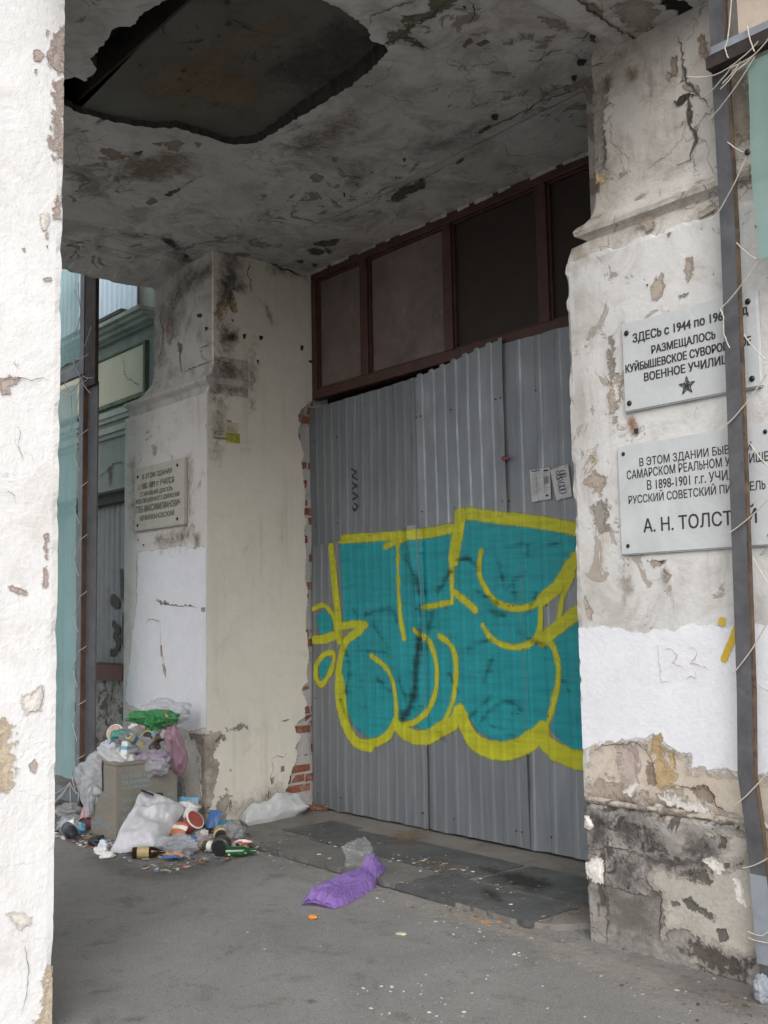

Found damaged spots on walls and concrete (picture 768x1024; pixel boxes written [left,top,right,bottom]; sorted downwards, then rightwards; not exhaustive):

peeling [33,25,65,173]
crack [674,38,709,165]
peeling [52,193,63,219]
peeling [646,273,666,300]
peeling [678,256,694,298]
flaking render [302,462,312,562]
peeling [583,455,610,535]
flaking render [0,717,38,793]
flaking render [285,706,313,805]
peeling [215,788,233,821]
water stain [590,813,603,843]
flaking render [583,732,757,1024]